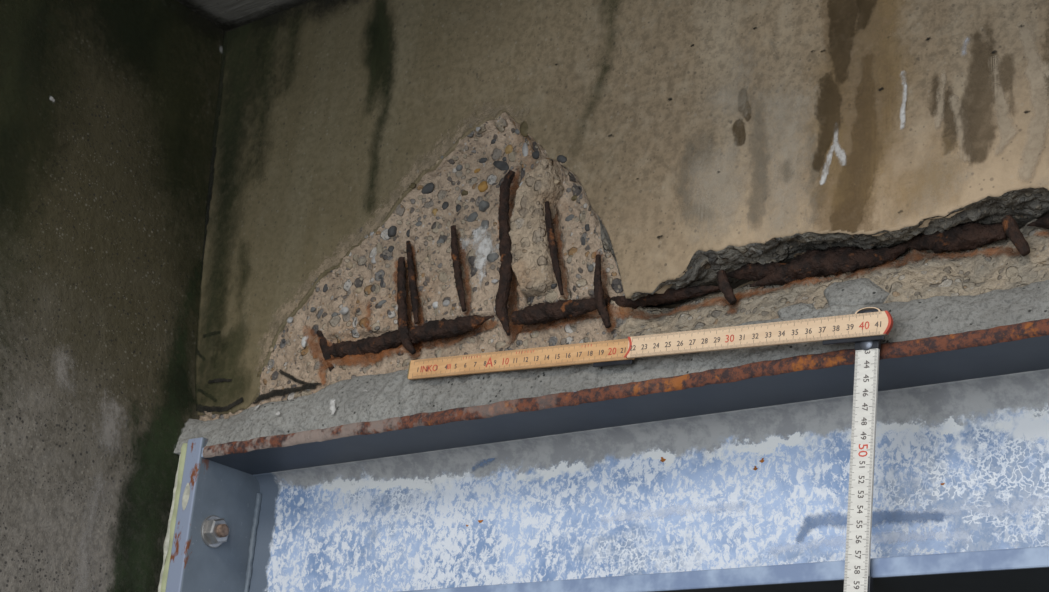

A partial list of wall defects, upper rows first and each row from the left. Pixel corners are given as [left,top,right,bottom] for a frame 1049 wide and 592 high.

water stain [366,0,391,208]
water stain [732,88,751,146]
water stain [812,0,878,233]
water stain [930,22,1049,180]
rust [304,320,496,384]
spalling [199,101,625,421]
rust [508,246,1020,341]